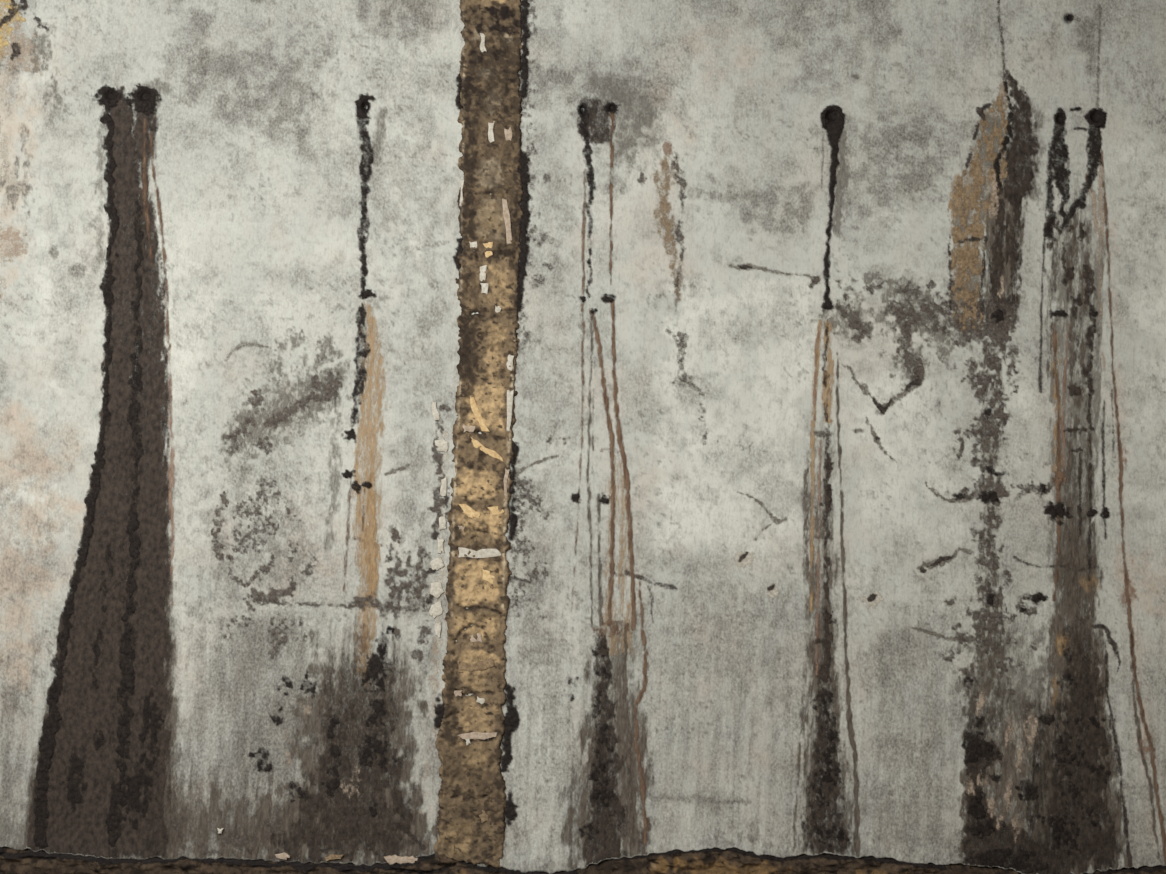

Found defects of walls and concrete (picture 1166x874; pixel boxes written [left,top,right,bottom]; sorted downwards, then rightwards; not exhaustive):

leakage [0,79,439,865]
spalling [0,0,536,874]
leakage [429,404,451,534]
leakage [516,480,548,520]
leakage [561,75,657,869]
crack [847,366,924,459]
crack [925,482,973,503]
leakage [793,70,1166,874]
leakage [511,520,548,617]
spalling [540,847,1022,874]
spalling [1083,865,1166,874]